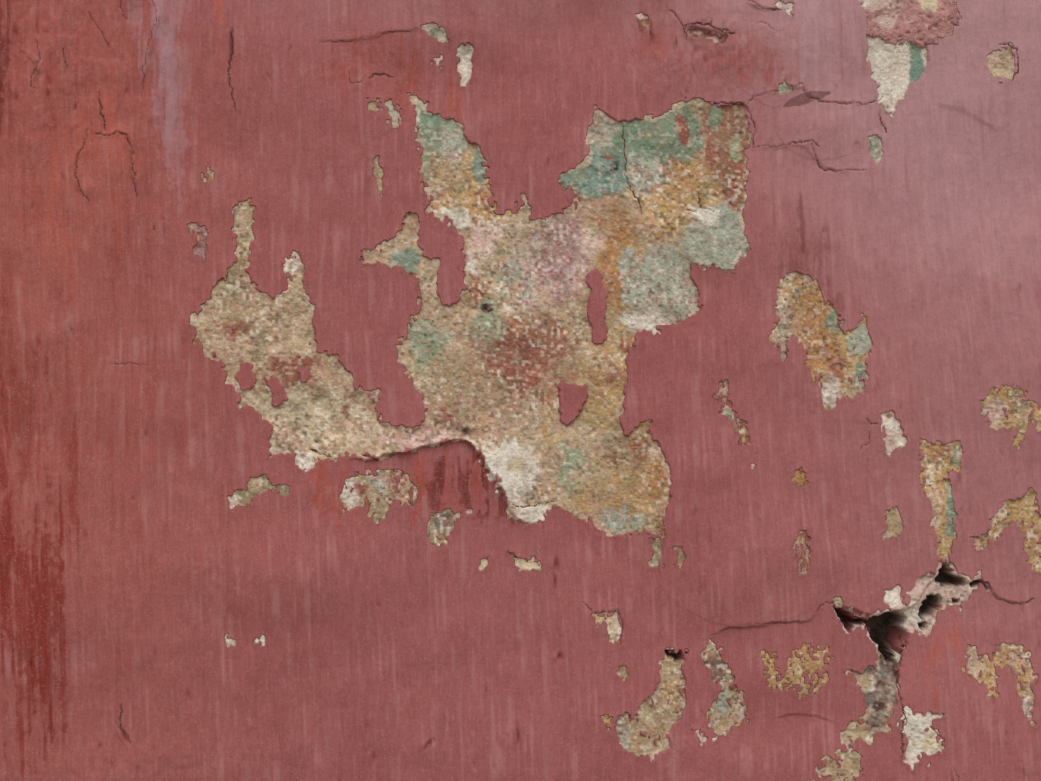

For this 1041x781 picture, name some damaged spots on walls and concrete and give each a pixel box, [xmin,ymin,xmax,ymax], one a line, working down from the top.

crack [670,10,731,40]
spalling [859,0,961,118]
crack [75,92,137,201]
peeling [188,93,751,568]
peeling [768,271,873,411]
peeling [979,383,1041,450]
peeling [970,488,1041,573]
spalling [813,411,990,781]
peeling [601,647,688,762]
peeling [690,639,749,746]
crack [896,635,945,760]
peeling [961,643,1038,726]